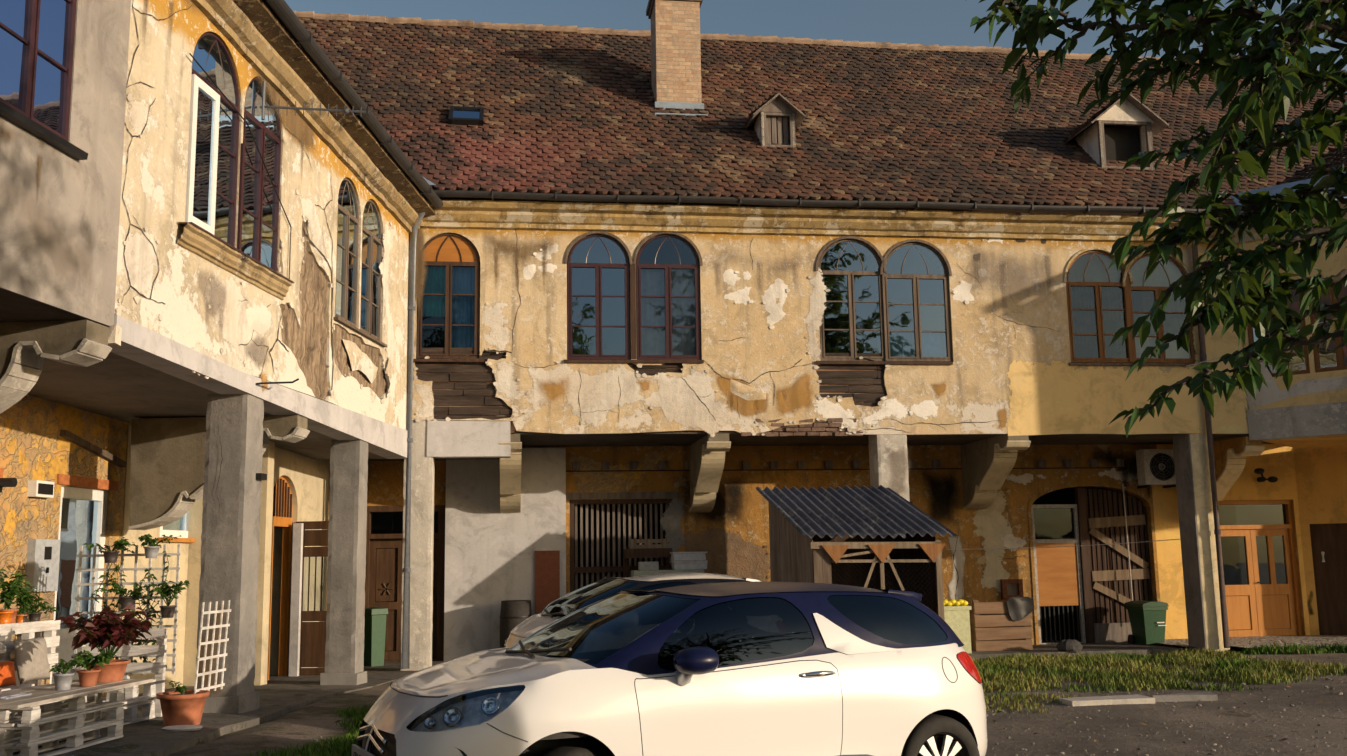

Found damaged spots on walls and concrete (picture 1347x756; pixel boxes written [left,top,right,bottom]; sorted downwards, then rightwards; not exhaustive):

crack [121,0,192,304]
flaking render [191,275,262,376]
flaking render [280,189,396,404]
flaking render [523,243,559,280]
flaking render [414,268,938,437]
flaking render [950,269,986,304]
water stain [926,475,956,521]
water stain [948,536,965,600]
flaking render [973,473,1068,596]
flaking render [1088,468,1138,484]